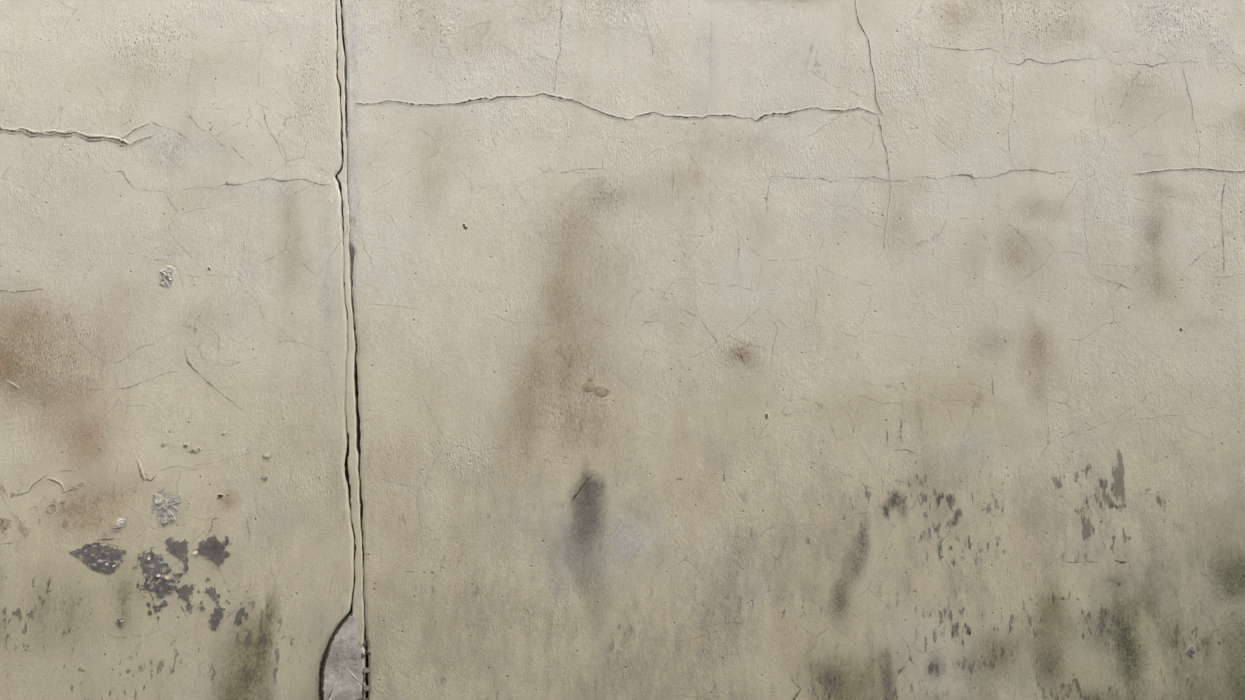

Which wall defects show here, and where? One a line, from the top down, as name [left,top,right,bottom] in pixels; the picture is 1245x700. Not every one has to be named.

crack [0,122,181,182]
crack [1130,166,1245,238]
crack [320,0,892,699]
peeling [0,470,102,544]
peeling [68,460,249,631]
peeling [319,612,371,700]